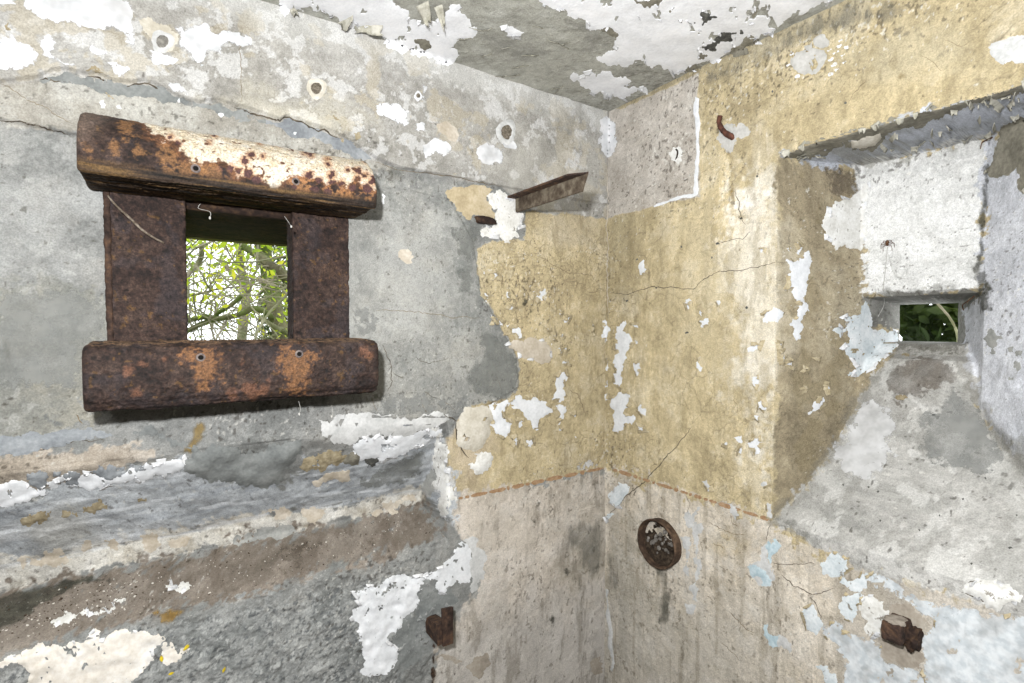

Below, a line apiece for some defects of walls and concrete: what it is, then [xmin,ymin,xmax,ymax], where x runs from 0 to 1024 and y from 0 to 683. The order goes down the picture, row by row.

peeling [279,0,570,77]
peeling [539,0,834,103]
spalling [445,184,526,243]
peeling [821,181,871,251]
crack [500,257,783,326]
peeling [489,288,577,448]
peeling [832,301,899,377]
spalling [319,411,457,518]
crack [607,428,691,516]
peeling [0,598,190,683]
peeling [349,536,491,679]
corrosion [903,624,924,653]